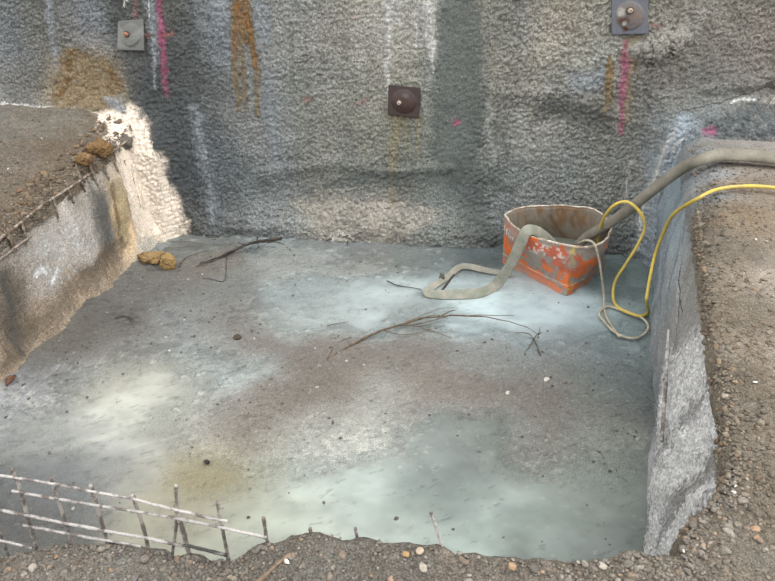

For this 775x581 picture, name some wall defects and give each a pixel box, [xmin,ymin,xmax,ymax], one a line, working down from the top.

spalling [103,125,134,181]
corrosion [230,0,260,117]
crack [663,86,773,116]
spalling [0,155,100,289]